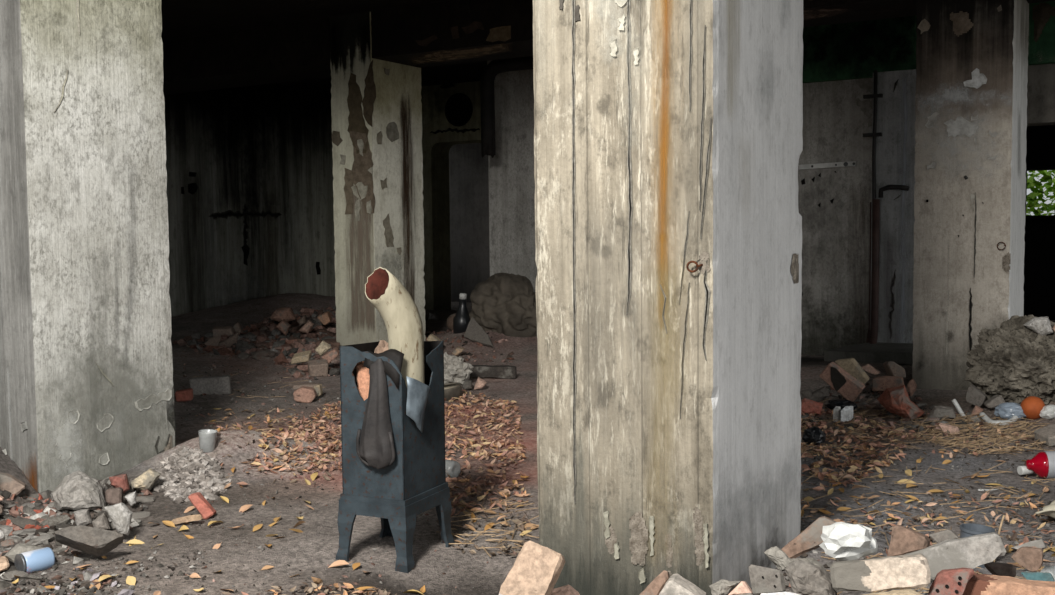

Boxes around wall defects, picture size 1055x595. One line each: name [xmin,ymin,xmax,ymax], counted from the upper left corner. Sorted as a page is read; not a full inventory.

peeling [917,19,930,34]
peeling [950,11,974,37]
peeling [963,68,987,89]
peeling [332,60,402,255]
leakage [349,98,415,329]
corrosion [659,94,668,325]
crack [888,269,896,339]